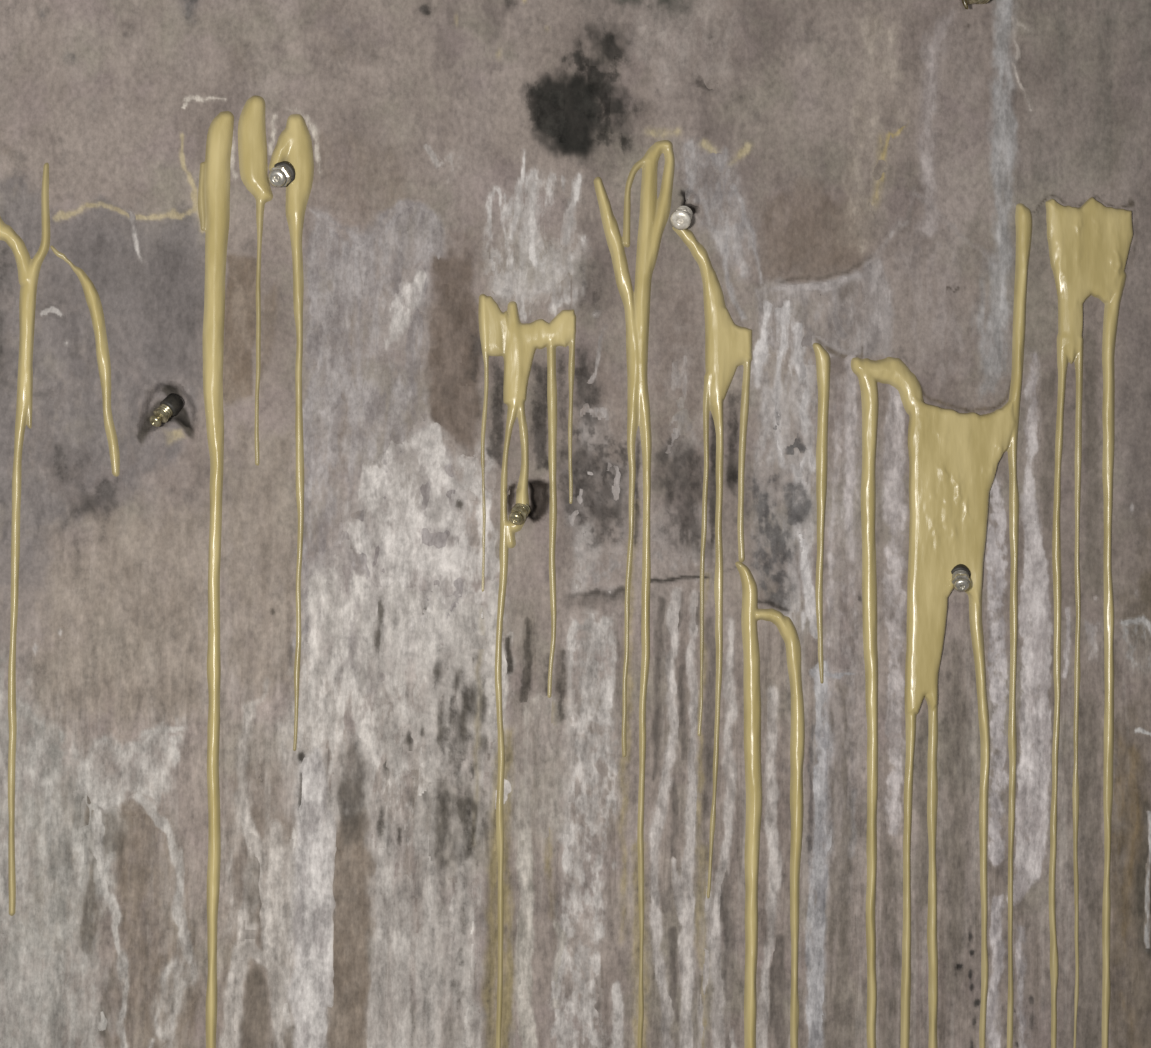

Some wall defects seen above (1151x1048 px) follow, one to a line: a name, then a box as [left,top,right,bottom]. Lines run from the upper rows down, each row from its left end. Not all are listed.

damp [641,0,1151,1048]
crack [558,564,737,614]
crack [758,598,792,615]